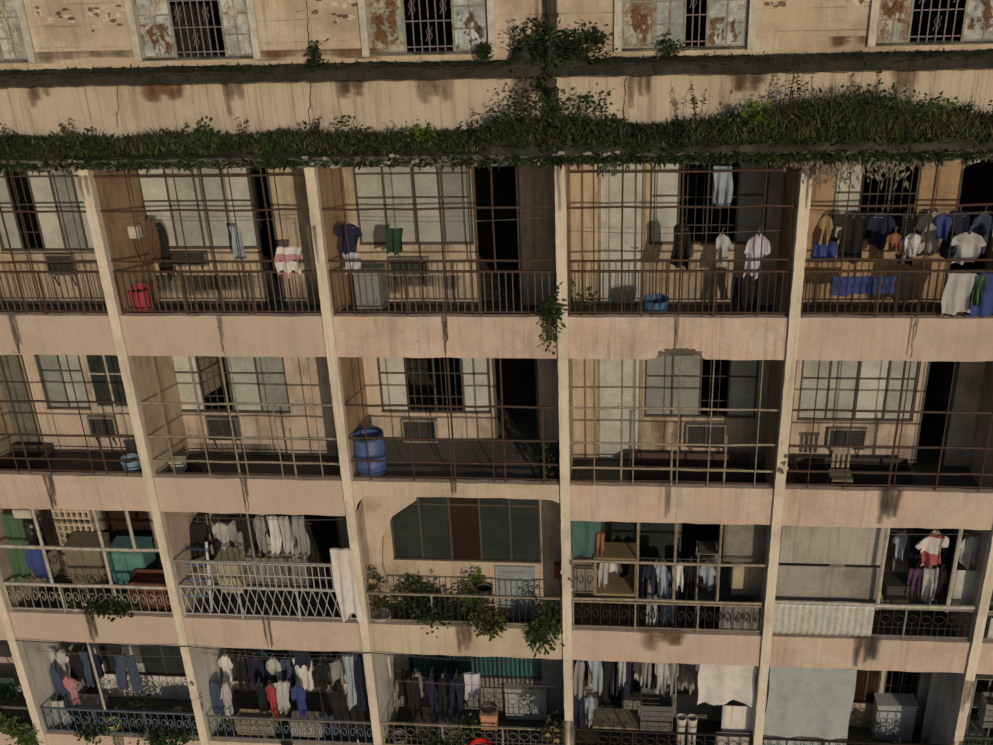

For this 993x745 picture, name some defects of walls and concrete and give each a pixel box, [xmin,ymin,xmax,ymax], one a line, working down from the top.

spalling [35,6,76,23]
spalling [87,4,126,32]
corrosion [143,23,173,54]
spalling [311,0,358,24]
corrosion [456,13,483,49]
corrosion [631,6,649,42]
corrosion [709,17,741,45]
corrosion [882,0,907,31]
corrosion [970,0,993,30]
damp [879,489,902,520]
damp [854,637,879,665]